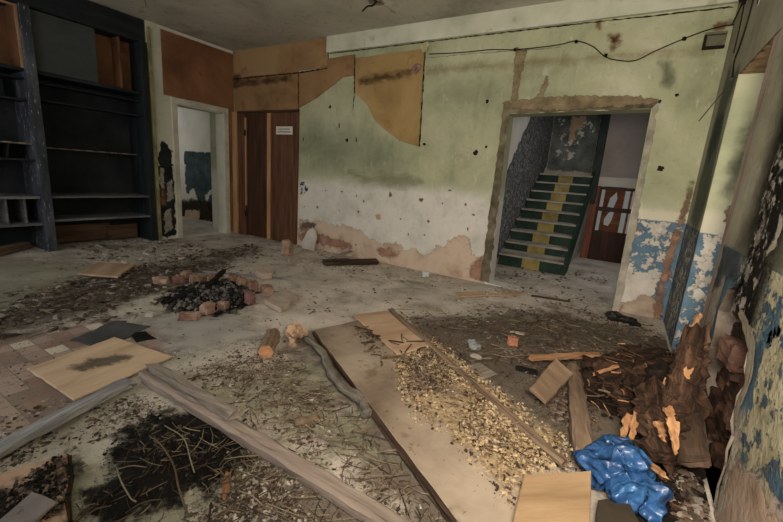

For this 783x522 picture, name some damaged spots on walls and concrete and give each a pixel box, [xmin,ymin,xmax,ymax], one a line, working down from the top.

crack [368,0,395,13]
crack [238,2,740,147]
peeling [158,141,212,238]
flaking render [297,219,485,284]
peeling [613,177,783,522]